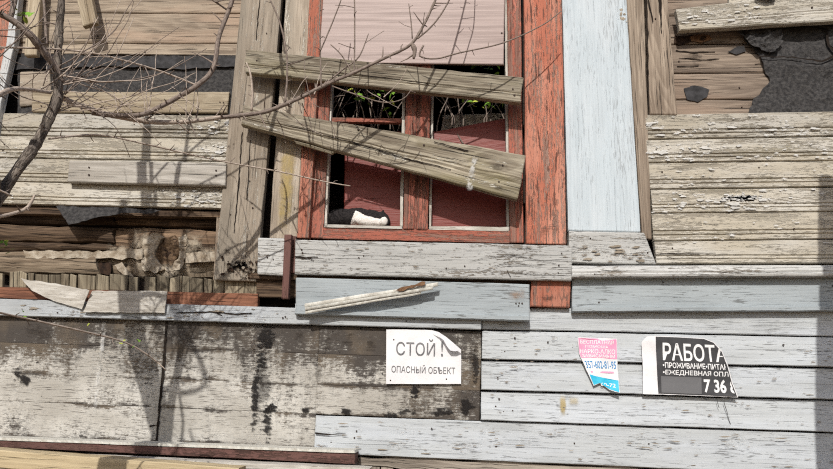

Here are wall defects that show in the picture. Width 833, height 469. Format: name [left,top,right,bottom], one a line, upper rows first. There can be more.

peeling [682,3,762,24]
peeling [646,120,771,213]
peeling [736,115,831,171]
spalling [114,233,209,276]
water stain [250,324,277,443]